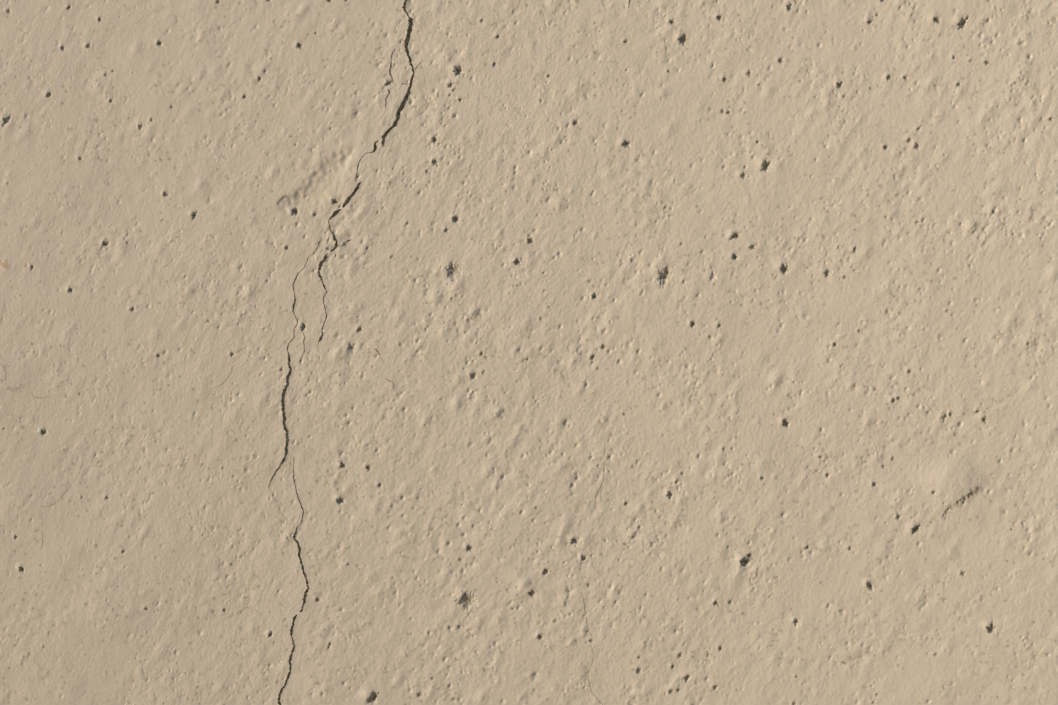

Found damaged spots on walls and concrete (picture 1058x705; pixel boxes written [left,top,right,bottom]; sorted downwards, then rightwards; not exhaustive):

crack [268,0,418,705]